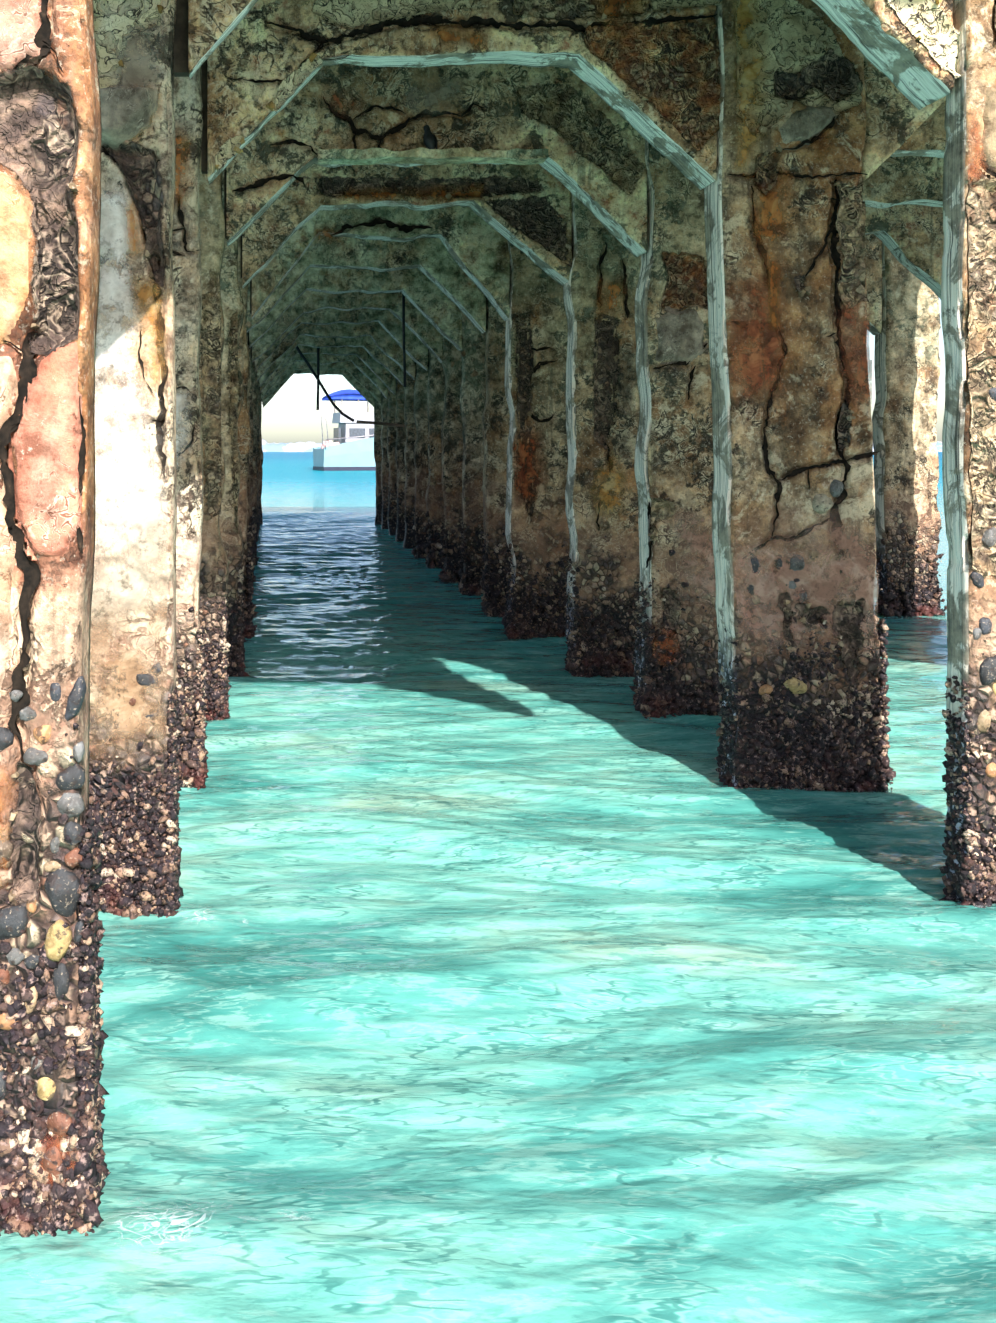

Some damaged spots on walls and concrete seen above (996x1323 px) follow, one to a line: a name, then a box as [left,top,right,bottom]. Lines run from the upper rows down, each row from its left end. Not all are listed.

crack [227,14,717,83]
crack [323,96,484,149]
crack [979,163,996,178]
corrosion [733,176,787,395]
crack [728,116,880,561]
corrosion [514,434,545,509]